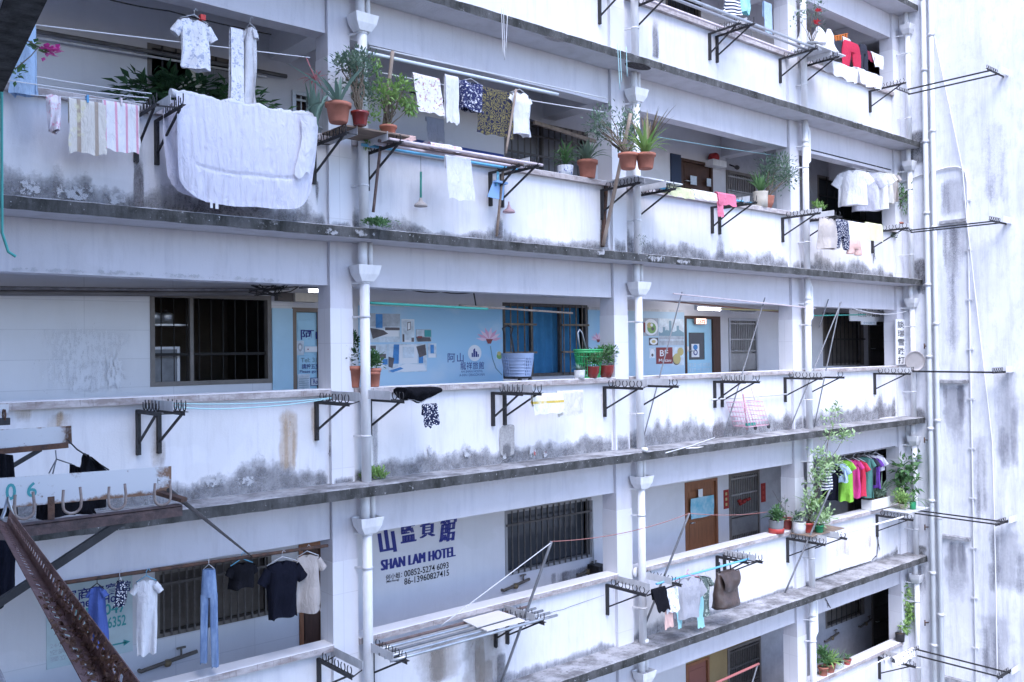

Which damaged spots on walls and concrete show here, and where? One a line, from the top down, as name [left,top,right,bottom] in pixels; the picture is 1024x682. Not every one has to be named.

peeling [20,179,41,197]
peeling [56,184,93,201]
damp [3,164,324,224]
damp [339,217,445,235]
damp [461,221,893,277]
damp [95,400,895,511]
damp [3,505,37,522]
rust [38,580,133,682]